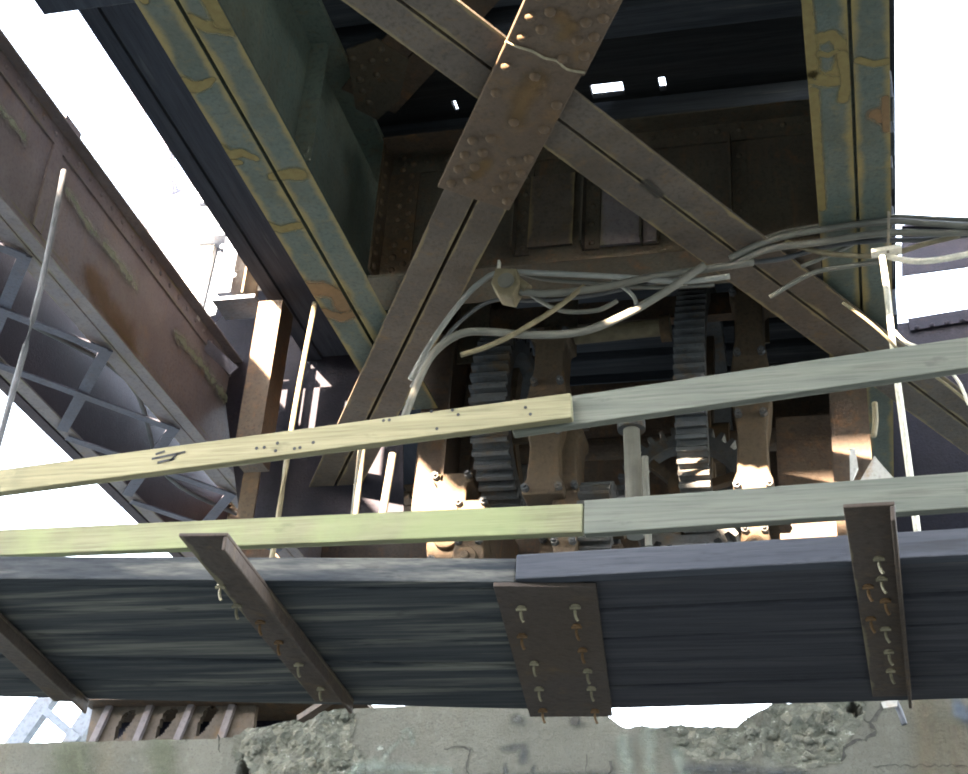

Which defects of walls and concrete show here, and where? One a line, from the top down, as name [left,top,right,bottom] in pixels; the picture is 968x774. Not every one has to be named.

spalling [232,708,363,774]
spalling [664,701,866,771]